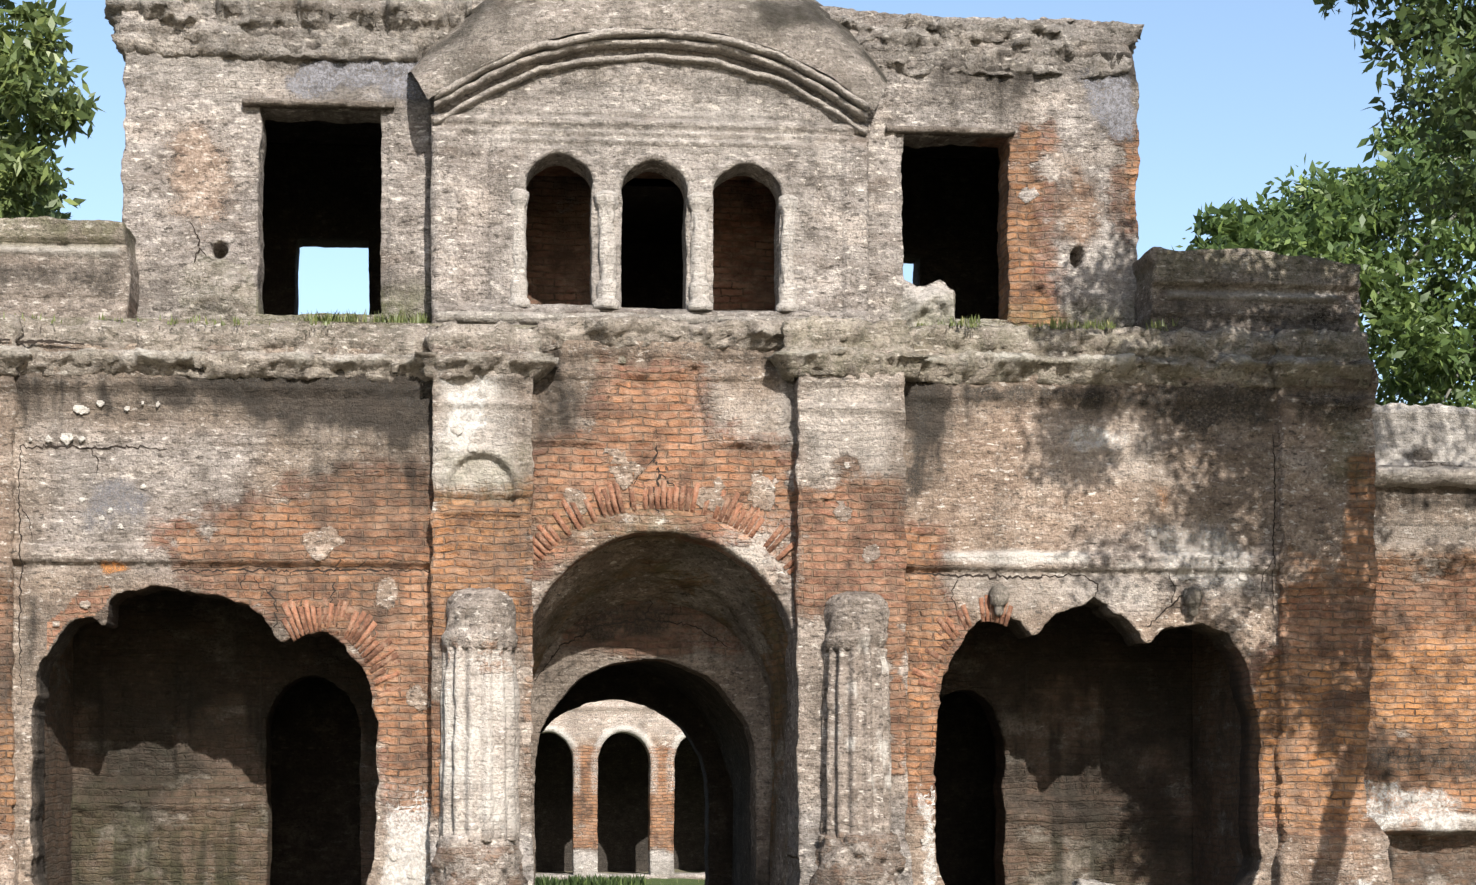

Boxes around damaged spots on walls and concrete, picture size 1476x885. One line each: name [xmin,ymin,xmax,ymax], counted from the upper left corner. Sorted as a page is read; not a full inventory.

flaking render [1007,124,1100,325]
crack [633,437,679,513]
leakage [905,382,936,495]
flaking render [161,366,958,812]
crack [913,573,1099,609]
crack [1147,574,1183,627]
flaking render [1253,564,1476,825]